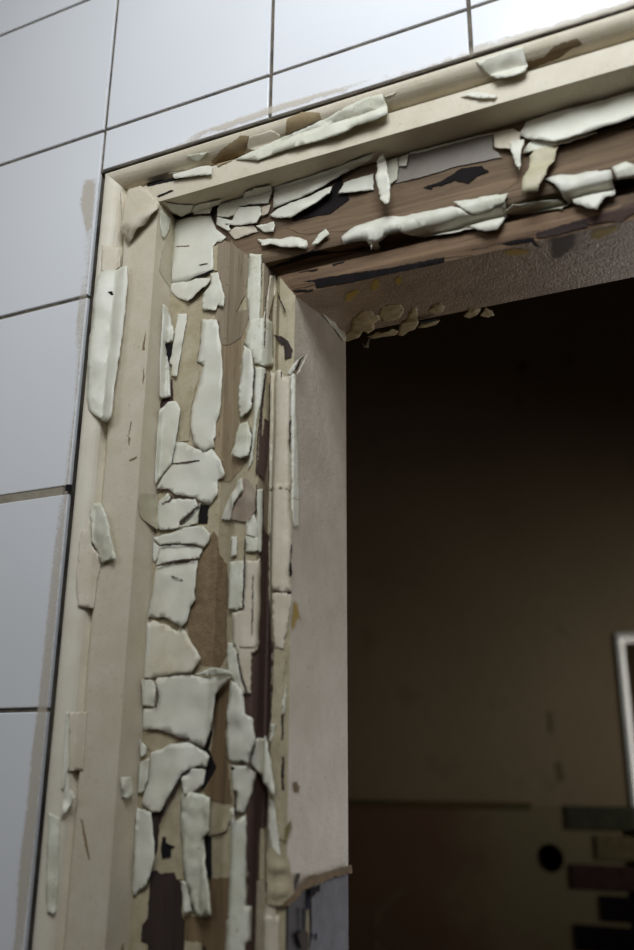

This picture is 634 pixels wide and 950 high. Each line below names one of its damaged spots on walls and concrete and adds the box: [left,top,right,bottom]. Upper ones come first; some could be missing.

peeling [476,39,582,79]
peeling [76,502,116,608]
peeling [87,92,634,950]
peeling [46,712,87,914]